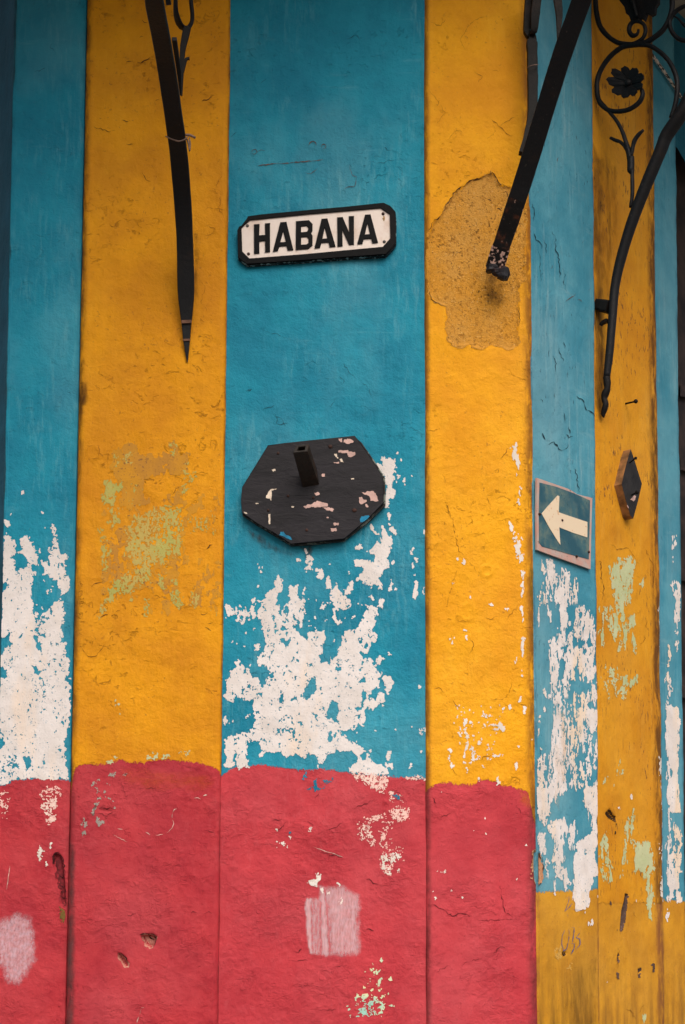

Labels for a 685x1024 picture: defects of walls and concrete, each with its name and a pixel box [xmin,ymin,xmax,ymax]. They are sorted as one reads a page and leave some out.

spalling [425,171,528,350]
peeling [510,442,522,505]
crack [542,393,594,487]
peeling [0,513,71,785]
peeling [97,438,413,792]
peeling [410,547,425,599]
peeling [489,521,525,623]
peeling [448,696,527,782]
peeling [516,555,683,926]
spalling [37,842,67,906]
peeling [308,873,343,905]
peeling [381,852,402,874]